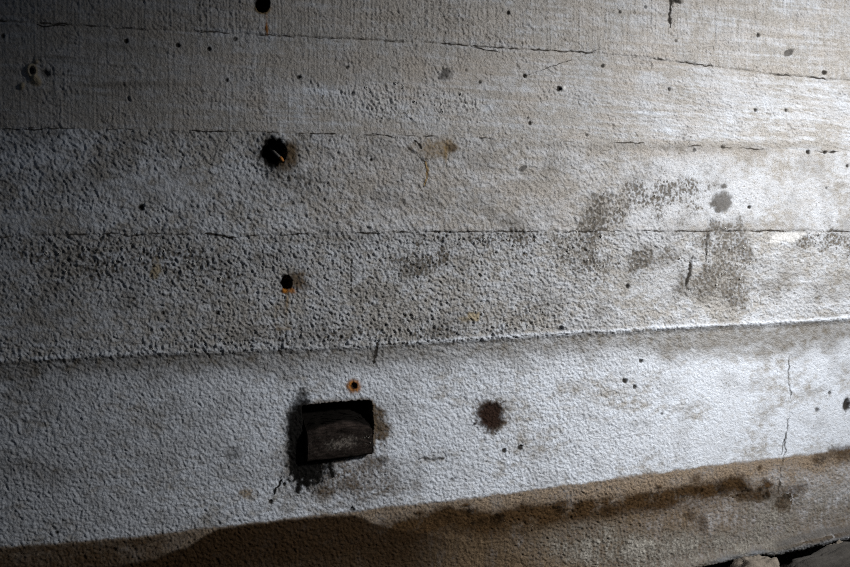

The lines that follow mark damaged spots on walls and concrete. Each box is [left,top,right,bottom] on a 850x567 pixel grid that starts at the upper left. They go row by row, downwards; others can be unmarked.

crack [668,0,679,28]
water stain [710,184,732,212]
rust [347,380,360,392]
water stain [308,399,393,501]
water stain [0,446,850,567]